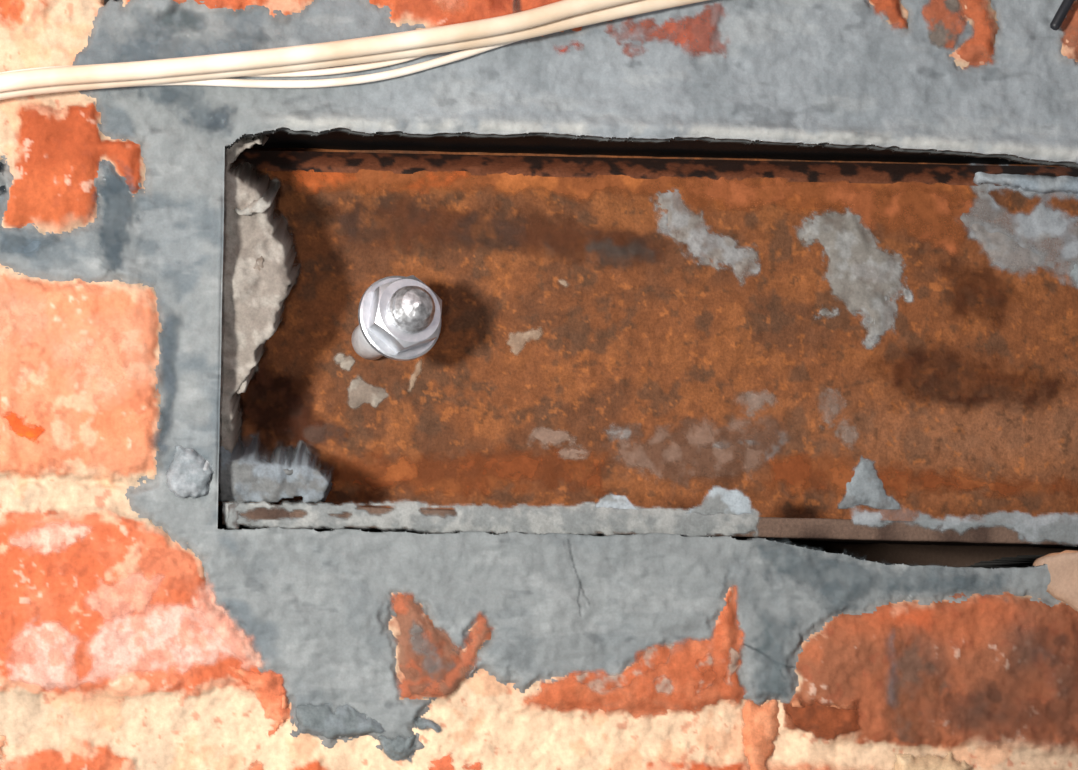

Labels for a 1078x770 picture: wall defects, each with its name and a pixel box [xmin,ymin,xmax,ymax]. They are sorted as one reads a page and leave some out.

spalling [874,0,905,28]
spalling [922,0,994,66]
spalling [1061,3,1078,60]
rust [264,168,972,255]
rust [893,350,1060,405]
rust [239,367,346,447]
rust [330,450,604,496]
rust [768,454,855,495]
rust [877,467,1069,498]
spalling [391,594,491,697]
spalling [524,586,745,718]